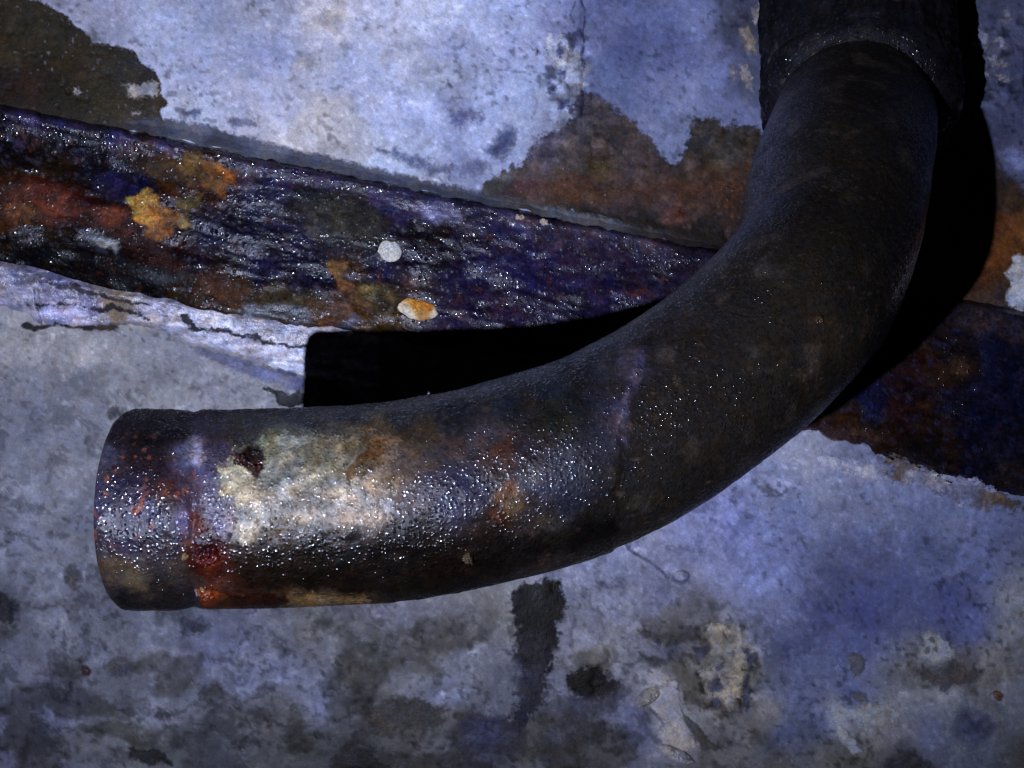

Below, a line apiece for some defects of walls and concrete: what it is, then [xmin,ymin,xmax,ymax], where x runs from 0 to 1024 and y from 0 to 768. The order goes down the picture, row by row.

rust [482,89,761,249]
rust [0,151,399,320]
rust [235,446,266,478]
rust [347,434,399,485]
rust [487,484,520,525]
rust [822,426,892,445]
rust [187,512,288,610]
leakage [461,578,566,750]